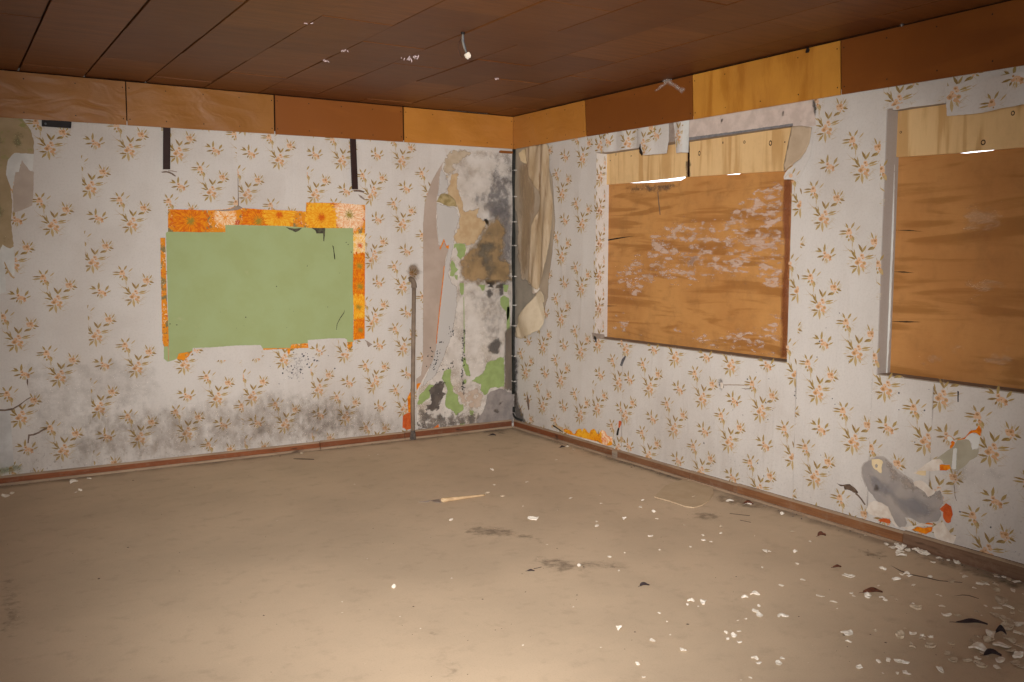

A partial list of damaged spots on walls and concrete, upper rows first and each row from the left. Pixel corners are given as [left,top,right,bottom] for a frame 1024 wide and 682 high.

flaking render [416,145,555,430]
spalling [861,456,956,544]